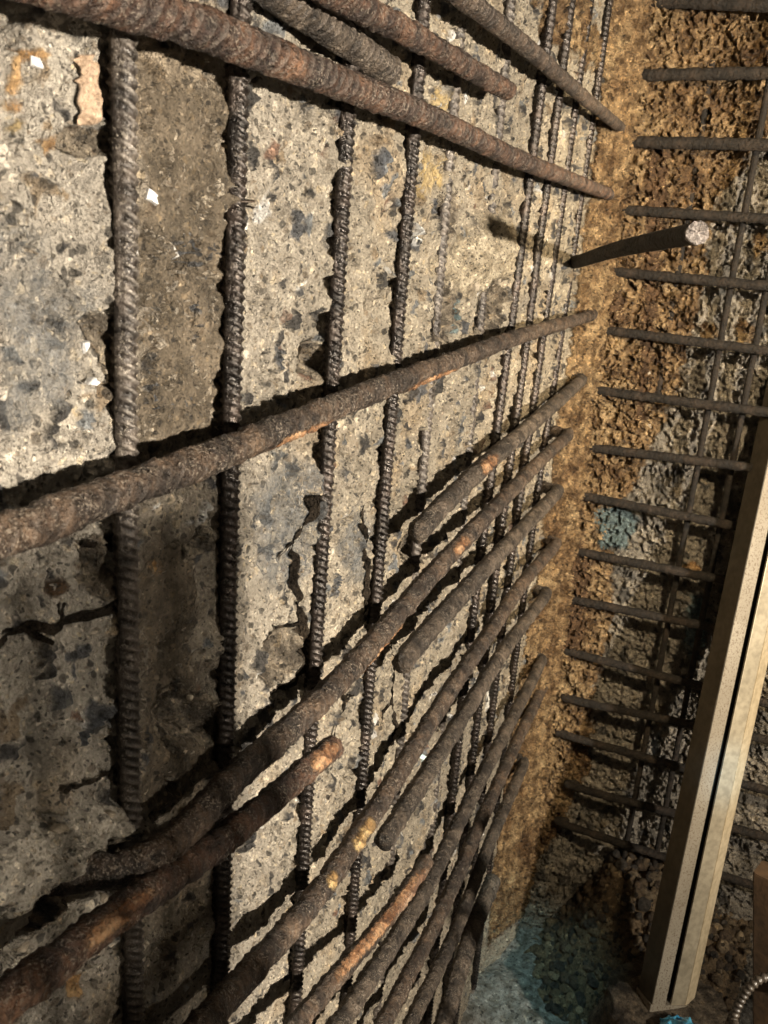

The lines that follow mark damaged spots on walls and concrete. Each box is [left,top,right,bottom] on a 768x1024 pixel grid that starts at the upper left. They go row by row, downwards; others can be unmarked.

corrosion [6,50,50,132]
corrosion [74,55,103,125]
corrosion [431,88,453,110]
corrosion [416,151,446,197]
spalling [0,0,709,829]
crack [0,602,117,649]
crack [273,495,321,692]
spalling [0,373,587,1024]